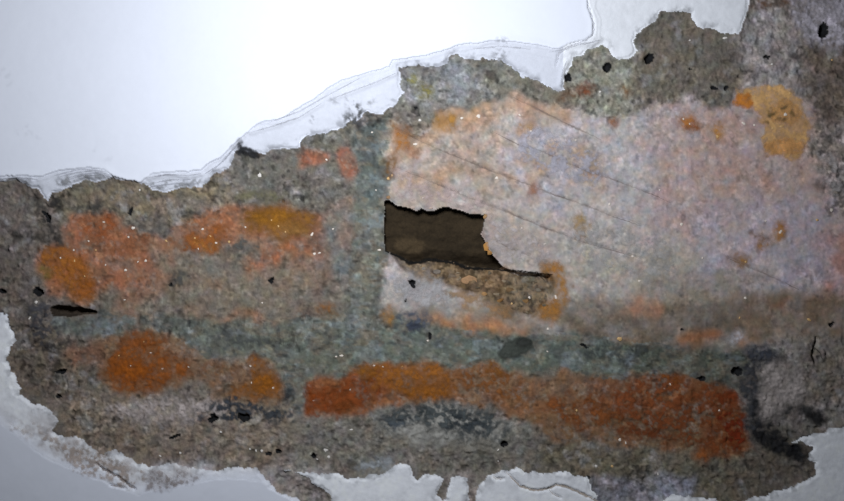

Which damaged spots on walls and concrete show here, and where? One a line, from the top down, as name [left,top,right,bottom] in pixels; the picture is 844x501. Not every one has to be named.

corrosion [733,85,810,158]
flaking render [0,0,844,352]
corrosion [244,207,314,239]
corrosion [106,331,188,391]
corrosion [307,362,521,414]
flaking render [0,313,844,501]
corrosion [547,375,744,458]